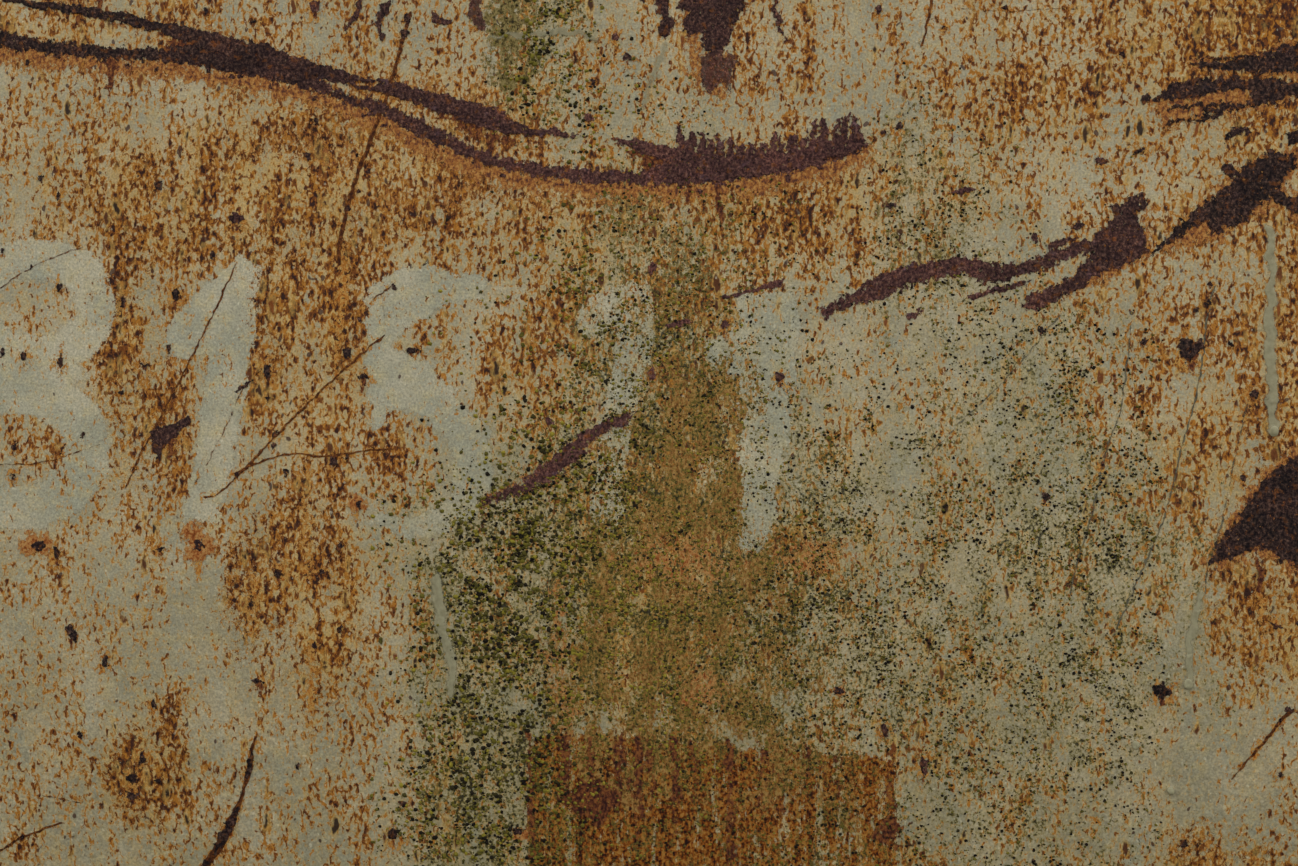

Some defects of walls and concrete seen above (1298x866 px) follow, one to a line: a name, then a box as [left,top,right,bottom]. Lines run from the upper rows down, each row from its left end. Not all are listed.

corrosion [0,0,1298,500]
corrosion [17,529,53,560]
corrosion [179,462,370,739]
corrosion [480,218,904,866]
corrosion [90,692,209,831]
corrosion [1160,811,1298,866]